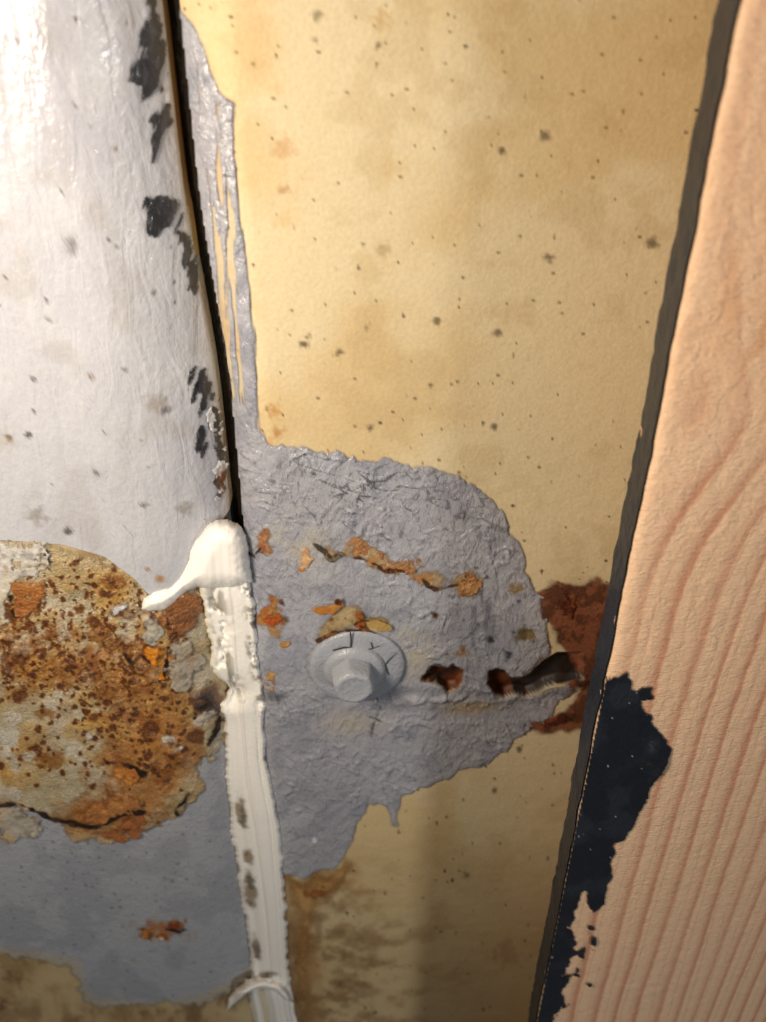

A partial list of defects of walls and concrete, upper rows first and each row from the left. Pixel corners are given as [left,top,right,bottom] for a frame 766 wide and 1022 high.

peeling [206,407,228,501]
corrosion [248,528,272,558]
corrosion [298,547,314,572]
peeling [313,537,483,597]
corrosion [256,596,291,648]
peeling [313,599,392,643]
corrosion [0,541,228,845]
corrosion [261,671,277,692]
corrosion [526,577,609,734]
corrosion [140,920,186,941]